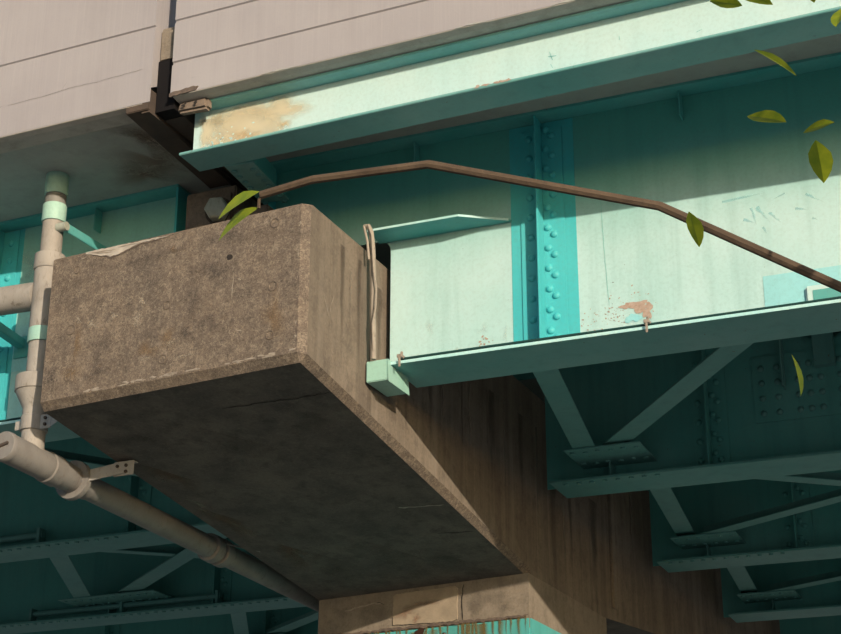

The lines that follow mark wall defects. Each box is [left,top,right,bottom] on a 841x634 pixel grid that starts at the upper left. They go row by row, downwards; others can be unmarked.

rust [202,102,299,146]
spalling [80,234,175,260]
rust [338,614,528,634]